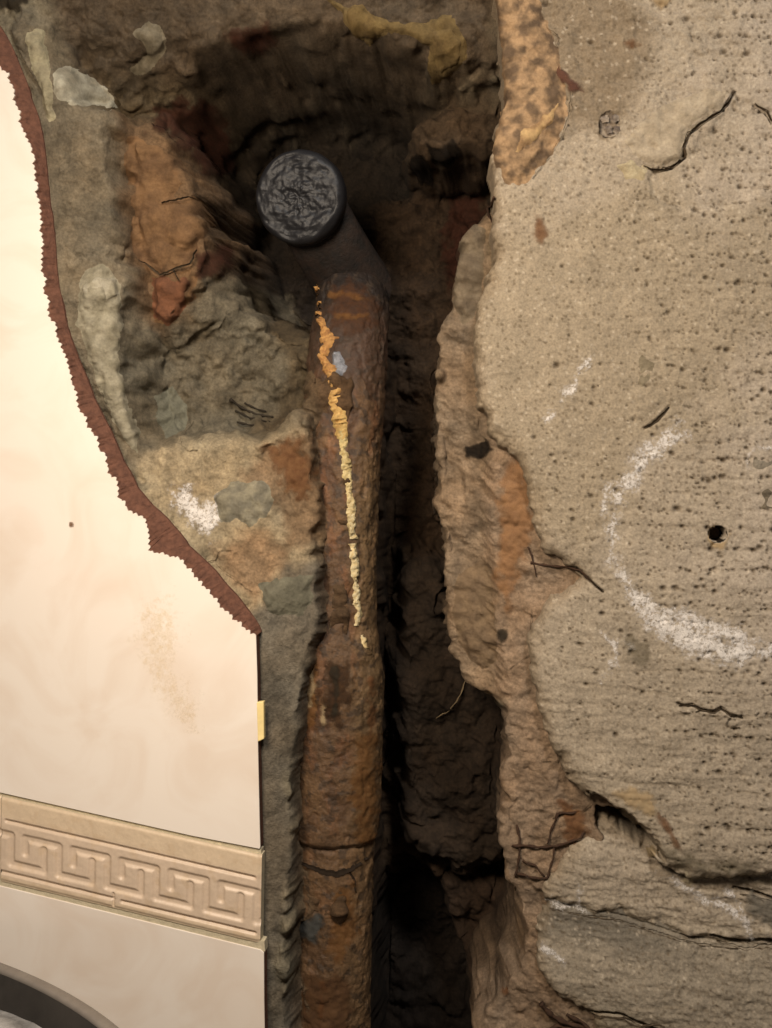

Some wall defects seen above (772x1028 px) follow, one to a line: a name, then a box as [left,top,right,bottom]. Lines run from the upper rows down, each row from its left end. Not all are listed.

peeling [328,0,467,85]
spalling [492,0,573,186]
peeling [332,351,347,376]
efflorescence [602,430,687,543]
leakage [607,556,772,664]
corrosion [308,663,352,729]
crack [679,704,743,728]
crack [550,907,770,951]